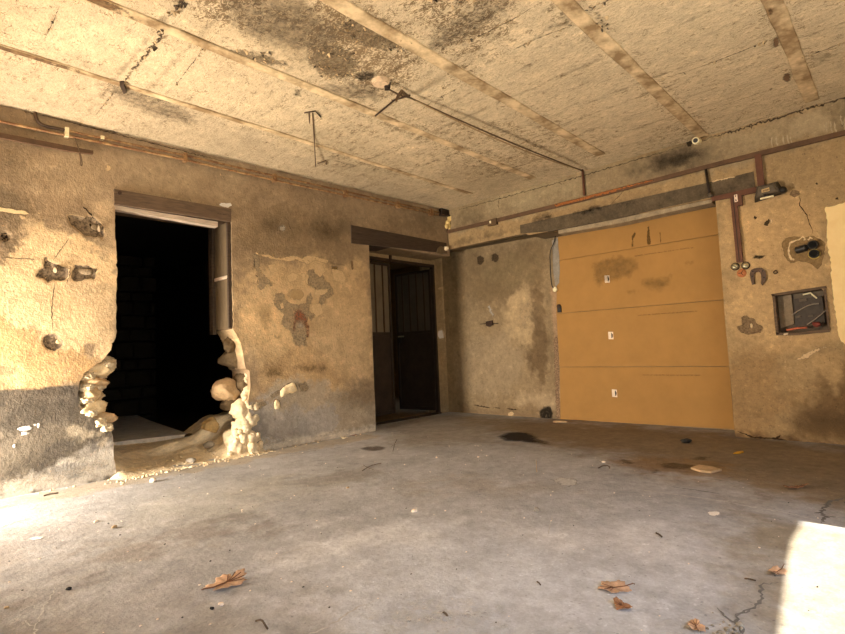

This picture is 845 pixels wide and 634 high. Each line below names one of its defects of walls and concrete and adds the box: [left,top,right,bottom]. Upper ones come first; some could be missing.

damp [234,1,331,48]
crack [25,0,223,161]
spalling [67,207,106,240]
spalling [35,256,99,283]
spalling [782,236,825,269]
peeling [253,252,353,341]
spalling [737,315,763,335]
spalling [79,356,117,432]
crack [620,486,843,523]
crack [717,582,778,634]